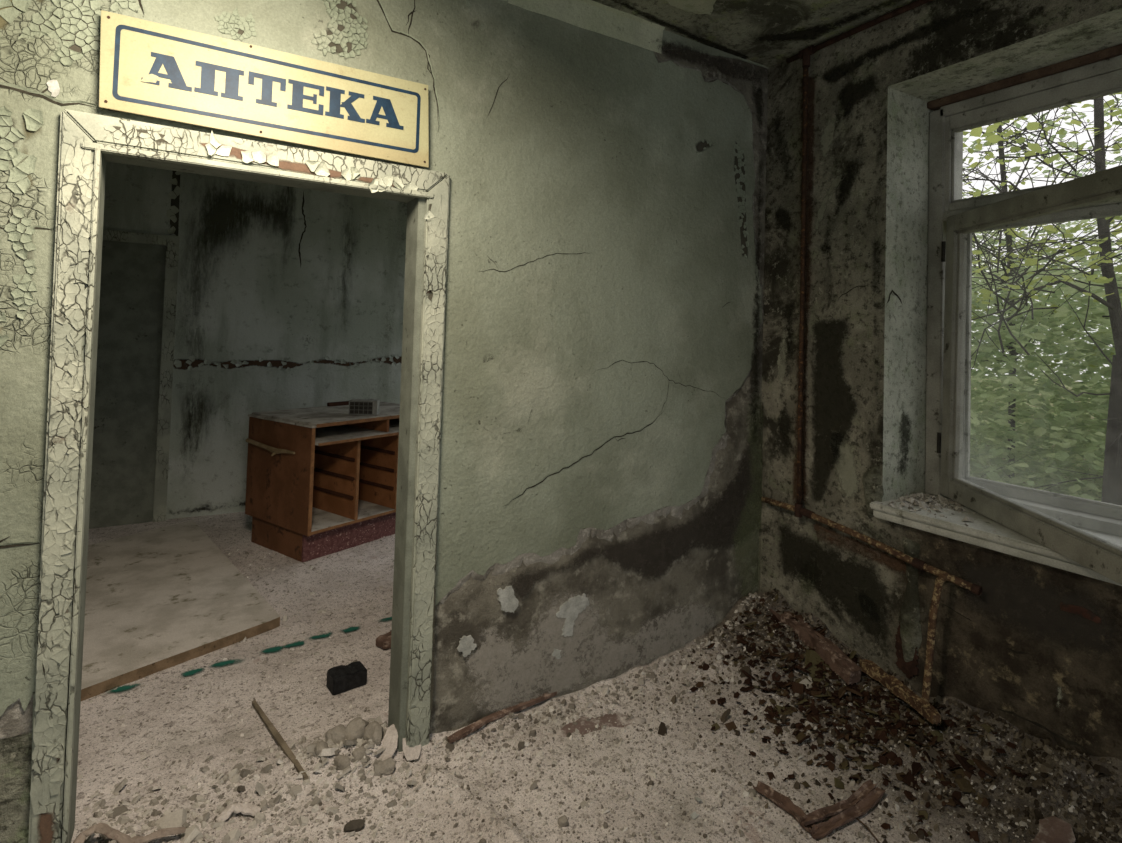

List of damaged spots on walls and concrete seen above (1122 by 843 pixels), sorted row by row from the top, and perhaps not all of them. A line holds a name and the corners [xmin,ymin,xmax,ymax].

peeling [0,0,140,66]
crack [377,0,440,130]
peeling [104,124,418,193]
crack [481,252,585,272]
rust [793,77,815,501]
peeling [0,142,94,843]
spalling [410,49,768,748]
crack [502,360,722,507]
damp [779,526,889,654]
damp [812,319,860,501]
rust [814,522,906,572]
damp [897,412,911,474]